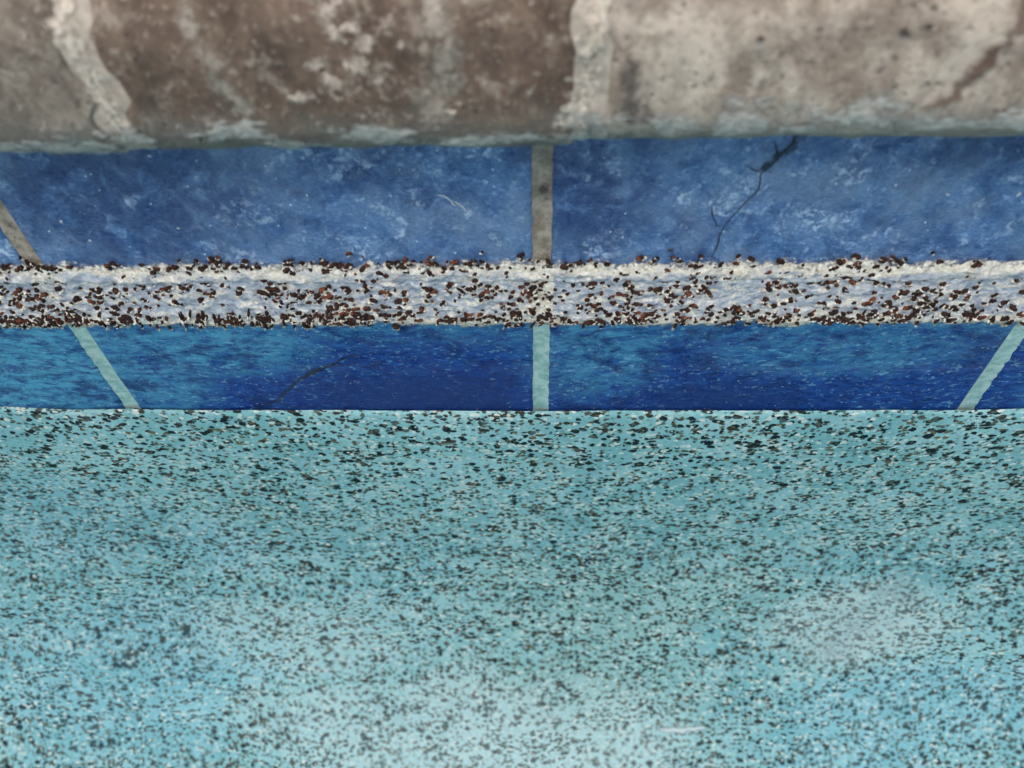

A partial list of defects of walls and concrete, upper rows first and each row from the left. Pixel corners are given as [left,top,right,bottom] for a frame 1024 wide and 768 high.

crack [711,135,807,258]